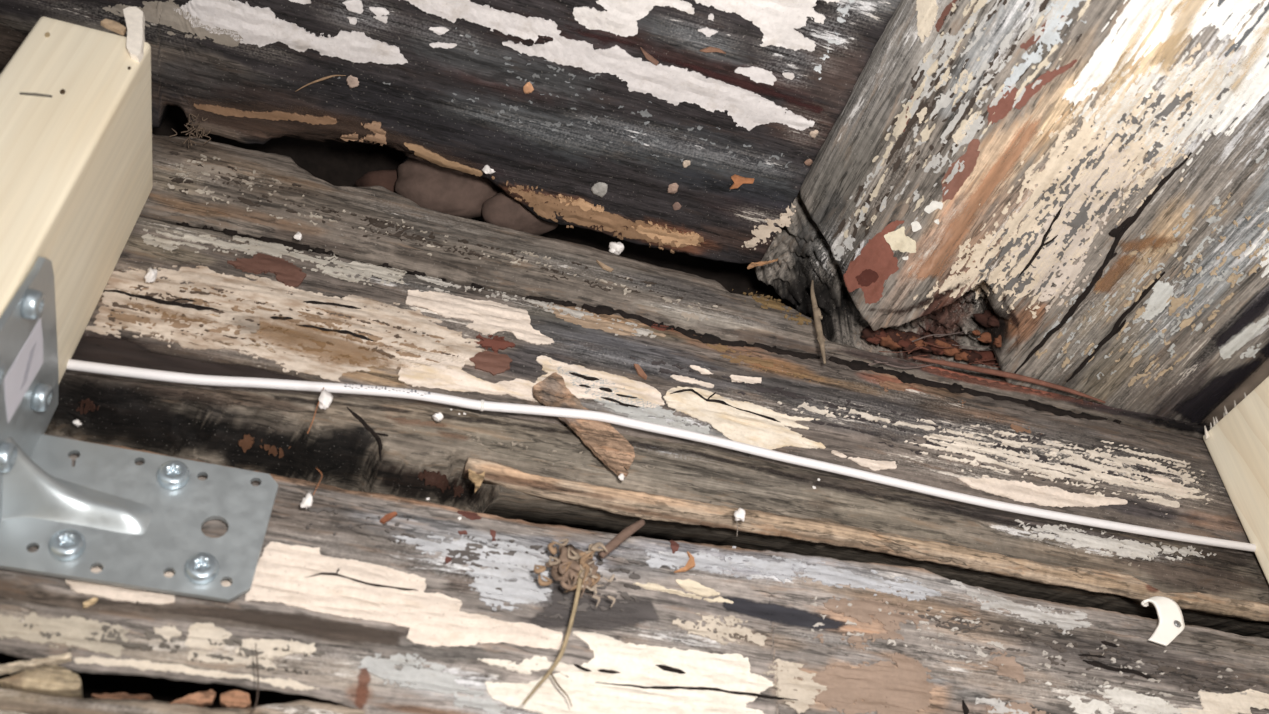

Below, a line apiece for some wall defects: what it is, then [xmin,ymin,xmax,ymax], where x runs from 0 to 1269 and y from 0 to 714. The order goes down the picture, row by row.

peeling [103,0,408,65]
peeling [167,154,346,230]
peeling [399,0,855,168]
peeling [86,225,1210,515]
peeling [741,203,796,250]
crack [526,152,1192,424]
peeling [832,0,1091,262]
peeling [913,0,1269,388]
peeling [65,566,175,605]
crack [574,664,798,701]
peeling [245,532,1269,714]
peeling [1015,519,1217,567]